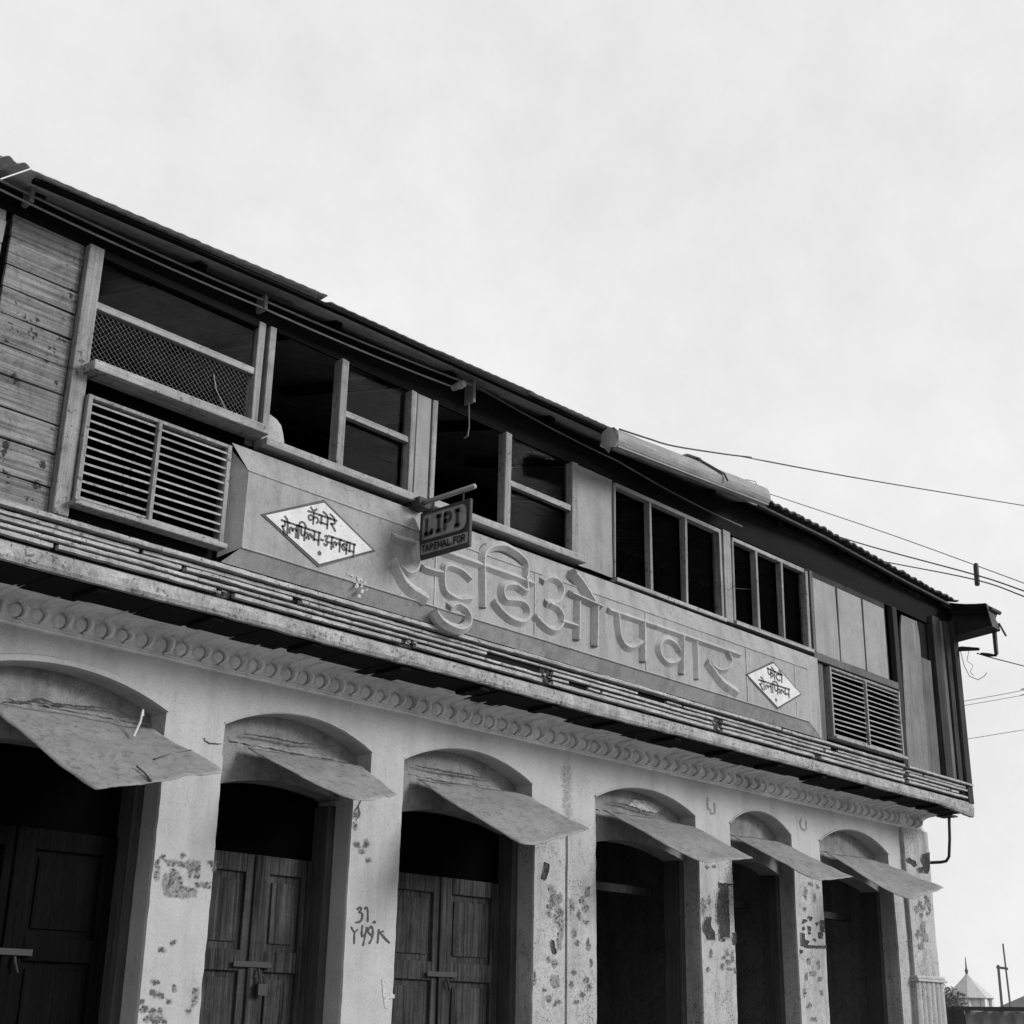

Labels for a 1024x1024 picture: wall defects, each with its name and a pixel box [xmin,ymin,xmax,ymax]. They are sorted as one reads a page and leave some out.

peeling [154,853,217,898]
peeling [532,862,593,1006]
flaking render [702,881,737,973]
flaking render [800,883,827,1022]
peeling [915,895,931,949]
peeling [139,980,177,1023]